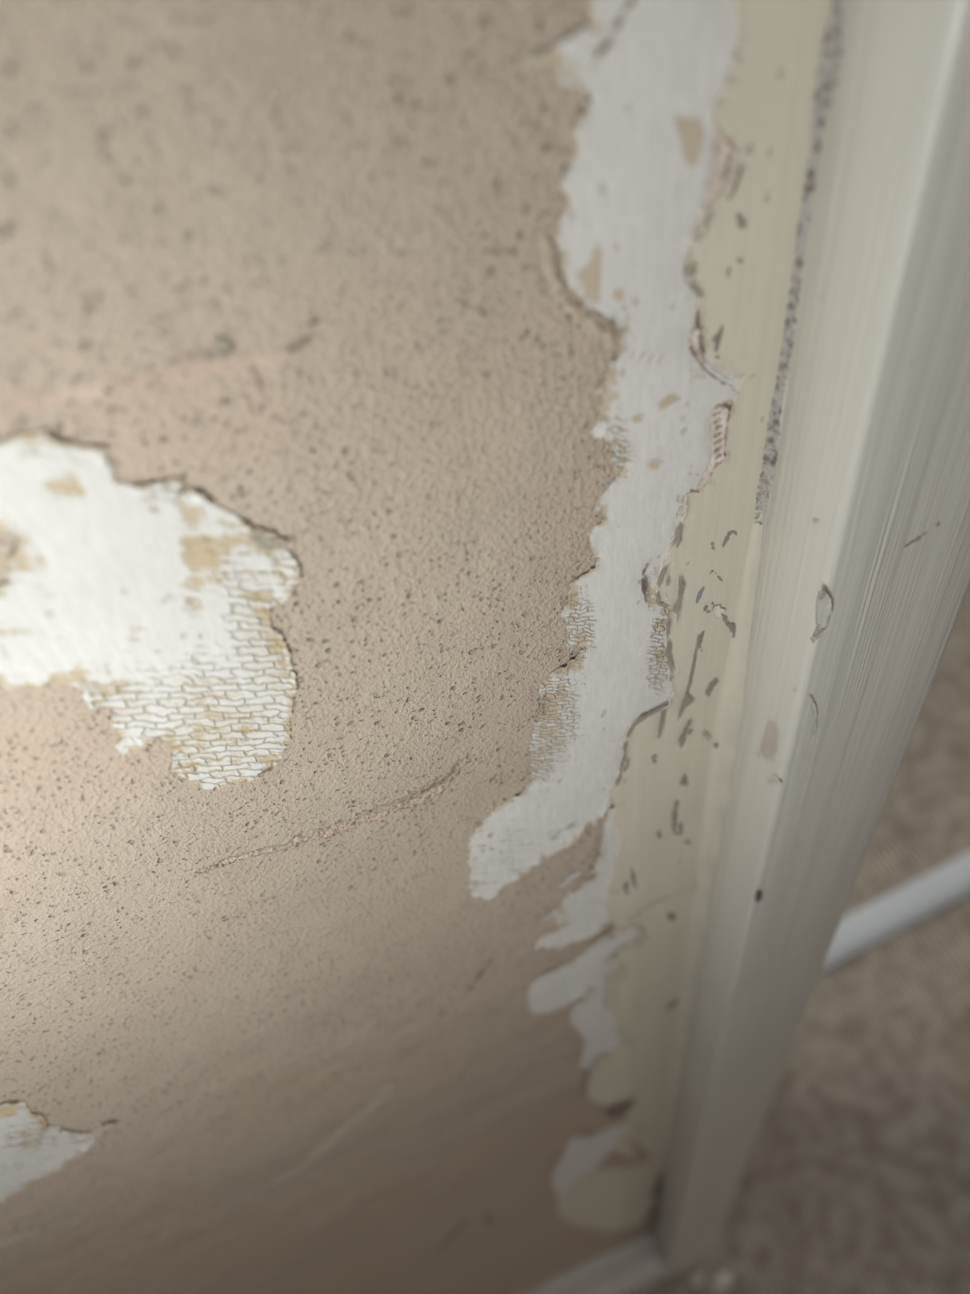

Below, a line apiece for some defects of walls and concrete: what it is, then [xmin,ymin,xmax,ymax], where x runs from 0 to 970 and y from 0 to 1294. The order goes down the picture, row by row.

peeling [559,0,832,1232]